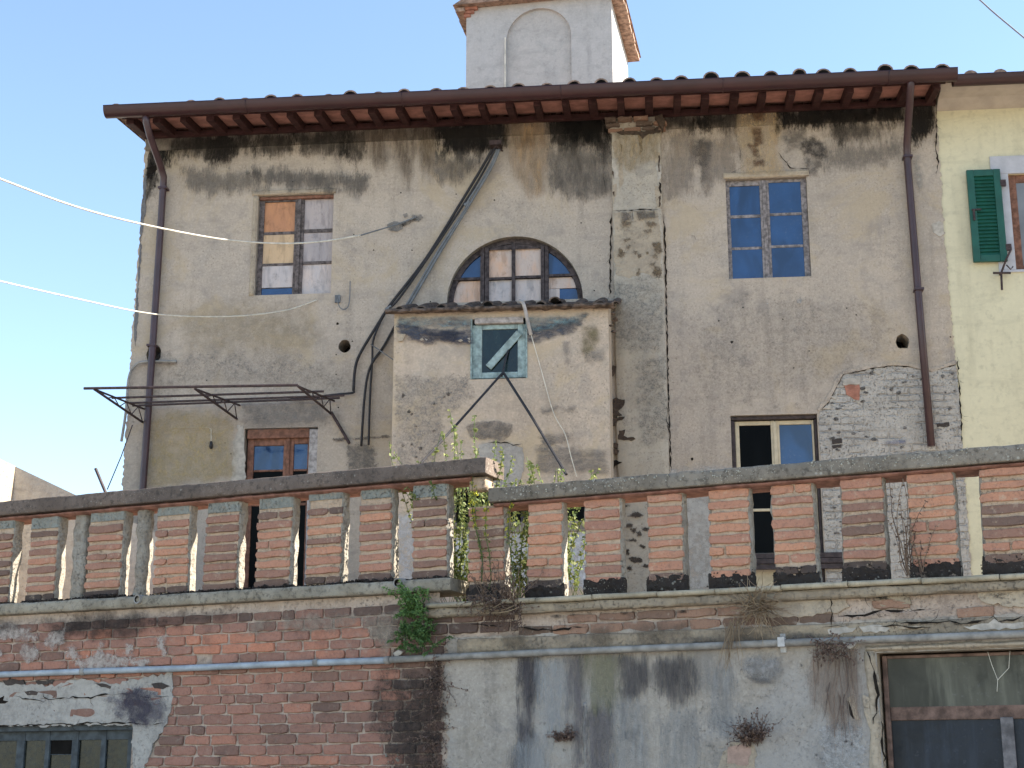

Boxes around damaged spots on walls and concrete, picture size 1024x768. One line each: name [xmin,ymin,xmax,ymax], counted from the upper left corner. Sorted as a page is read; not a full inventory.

water stain [145,129,410,202]
water stain [421,112,656,199]
water stain [669,98,936,173]
peeling [612,114,665,349]
water stain [398,317,472,344]
crack [608,209,672,468]
peeling [819,361,963,460]
peeling [822,487,842,582]
peeling [886,482,912,579]
flaking render [0,679,55,704]
water stain [511,654,697,768]
crack [867,652,886,765]